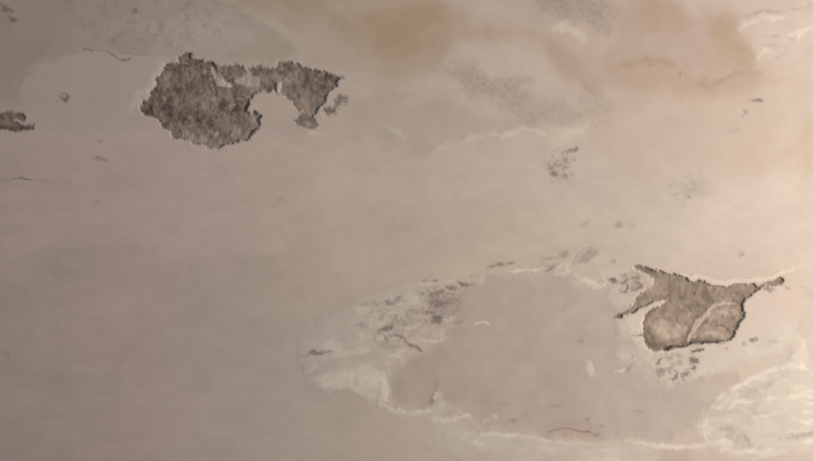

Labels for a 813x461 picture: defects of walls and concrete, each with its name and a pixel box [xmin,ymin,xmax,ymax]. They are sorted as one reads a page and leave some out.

flaking render [0,109,36,134]
flaking render [138,51,348,152]
damp [0,0,813,207]
peeling [353,260,516,353]
damp [296,264,813,461]
peeling [540,246,600,274]
flaking render [605,258,813,387]